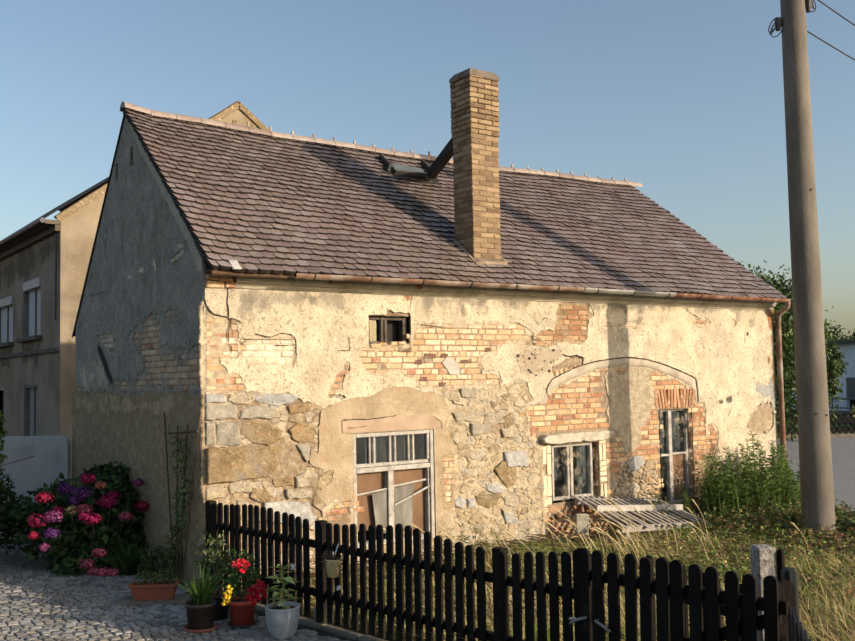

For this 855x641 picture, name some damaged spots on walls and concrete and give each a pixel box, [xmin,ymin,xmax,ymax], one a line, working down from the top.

crack [97,344,112,395]
spalling [98,301,364,576]
crack [204,288,297,361]
spalling [328,302,720,553]